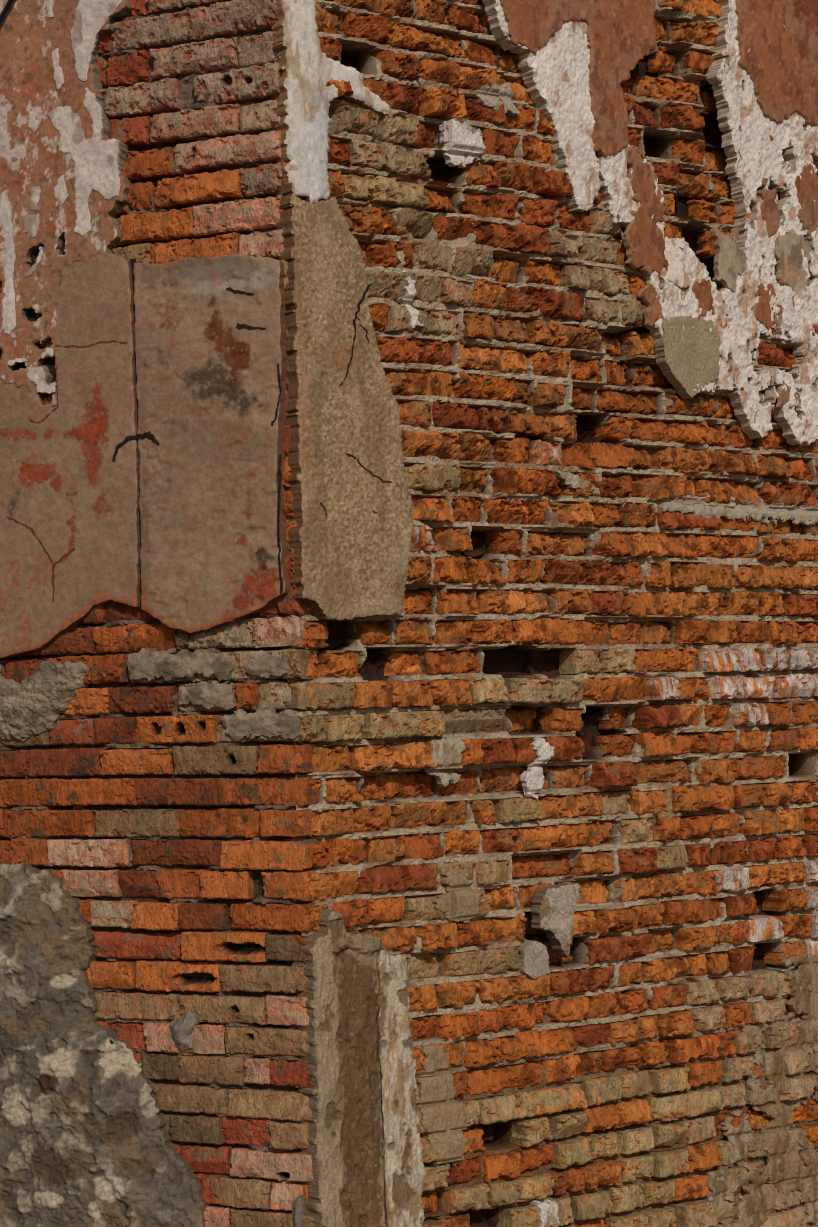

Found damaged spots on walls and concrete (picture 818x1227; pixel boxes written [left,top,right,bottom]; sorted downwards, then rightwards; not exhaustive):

peeling [0,343,57,407]
peeling [0,0,123,335]
crack [29,258,159,609]
crack [330,284,371,401]
crack [346,453,400,487]
flaking render [482,0,818,447]